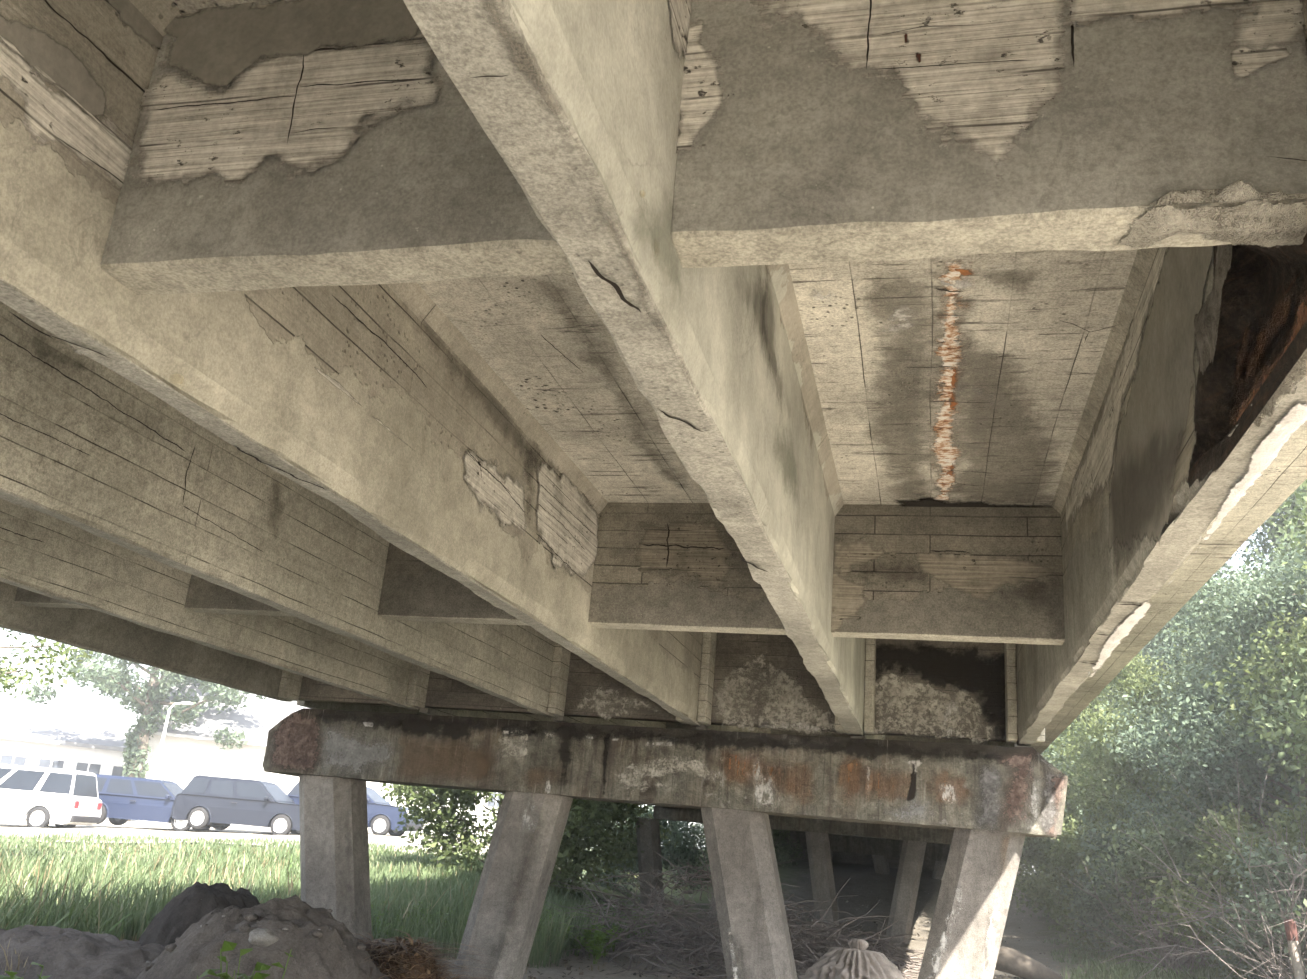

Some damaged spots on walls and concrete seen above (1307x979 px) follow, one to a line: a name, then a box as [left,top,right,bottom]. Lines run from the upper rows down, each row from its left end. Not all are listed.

peeling [0,32,451,189]
peeling [750,0,1307,181]
damp [889,308,912,331]
corrosion [907,261,994,501]
damp [896,498,1041,508]
spalling [1065,179,1307,544]
spalling [1169,330,1307,584]
corrosion [1230,296,1307,425]
spalling [1089,602,1151,677]
damp [316,642,1006,818]
corrosion [715,754,808,804]
corrosion [936,772,969,803]